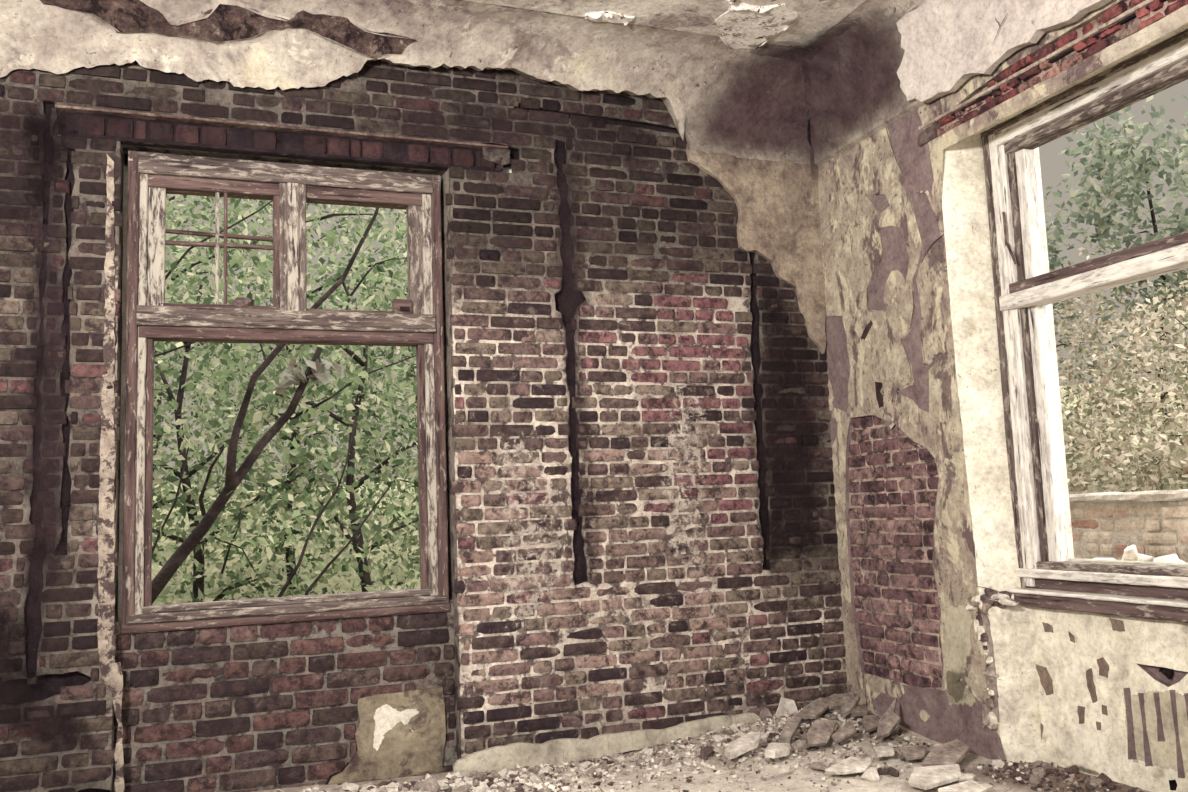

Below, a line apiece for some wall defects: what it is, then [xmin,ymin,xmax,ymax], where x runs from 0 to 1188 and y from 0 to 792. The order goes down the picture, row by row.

peeling [35,0,419,59]
peeling [582,10,634,25]
damp [702,24,901,162]
spalling [480,142,519,168]
spalling [686,0,1188,764]